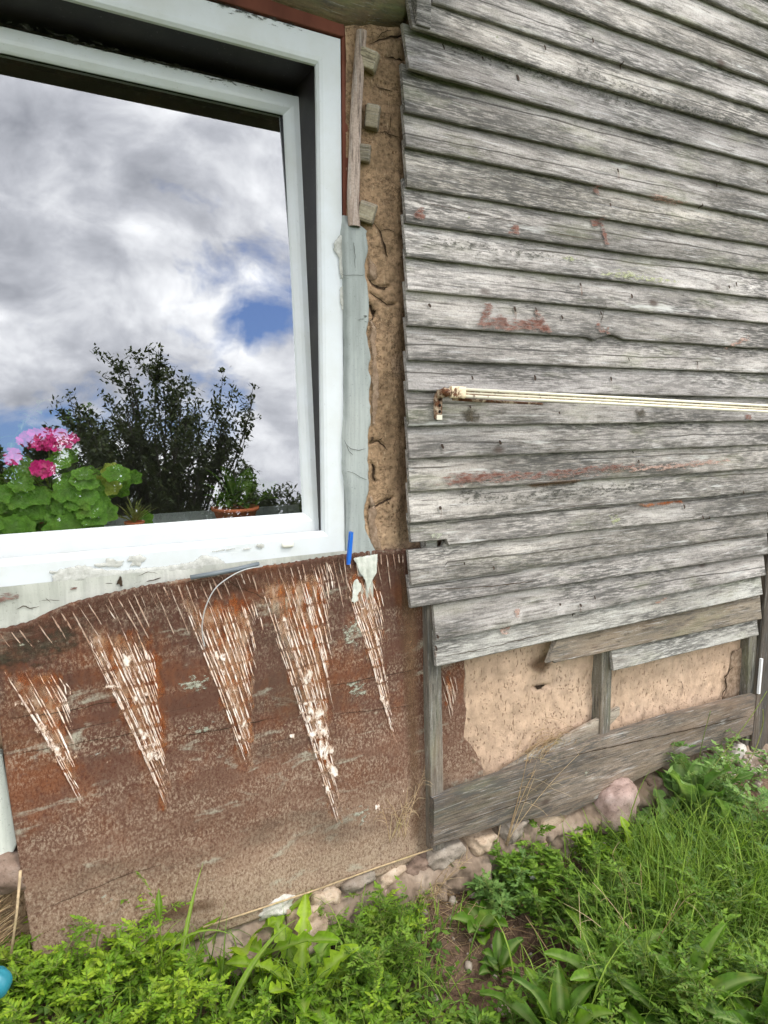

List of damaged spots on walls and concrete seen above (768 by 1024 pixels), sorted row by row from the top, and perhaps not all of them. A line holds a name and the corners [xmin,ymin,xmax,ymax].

crack [370,30,402,61]
leakage [0,628,78,666]
corrosion [5,672,83,804]
corrosion [89,632,169,810]
peeling [52,554,404,656]
corrosion [183,564,397,826]